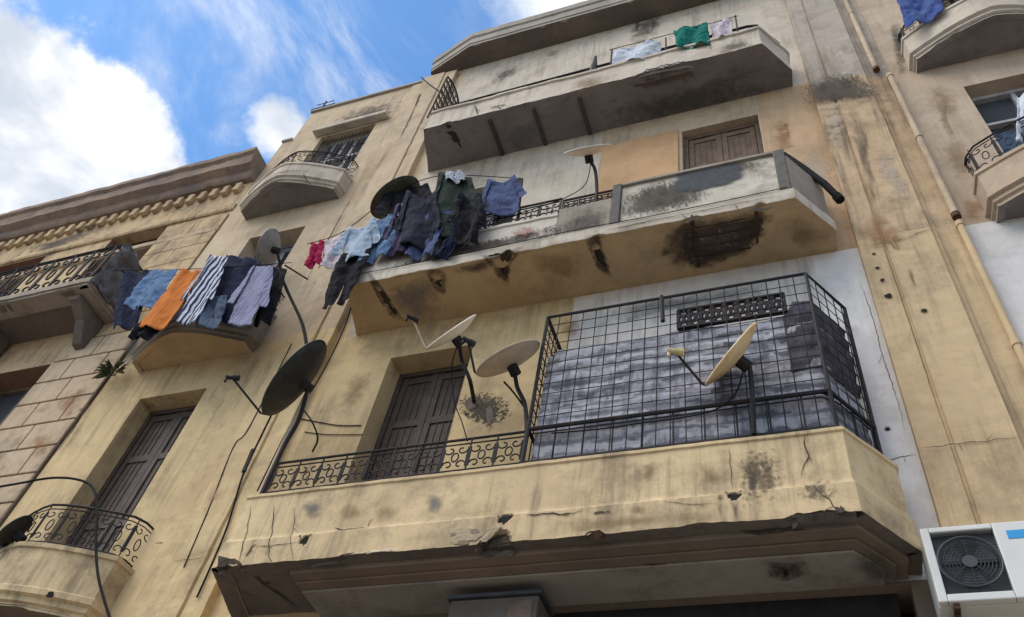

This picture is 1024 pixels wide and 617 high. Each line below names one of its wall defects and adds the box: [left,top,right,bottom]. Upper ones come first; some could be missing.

water stain [674,162,768,191]
crack [860,229,942,420]
crack [890,434,1015,460]
water stain [743,453,779,497]
crack [801,437,838,512]
crack [238,506,296,604]
spalling [449,526,514,558]
spalling [740,506,856,535]